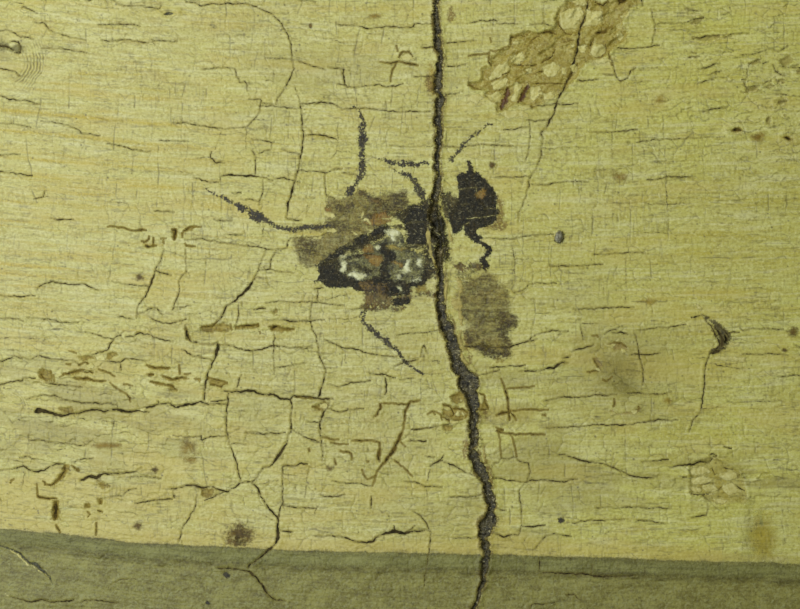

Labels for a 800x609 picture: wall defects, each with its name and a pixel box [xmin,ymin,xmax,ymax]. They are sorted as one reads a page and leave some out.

crack [0,3,85,73]
crack [98,5,165,44]
crack [177,0,466,221]
crack [474,2,632,212]
peeling [467,0,640,119]
crack [6,281,96,297]
crack [14,440,92,478]
crack [34,214,676,609]
crack [652,353,779,478]
crack [13,578,134,603]